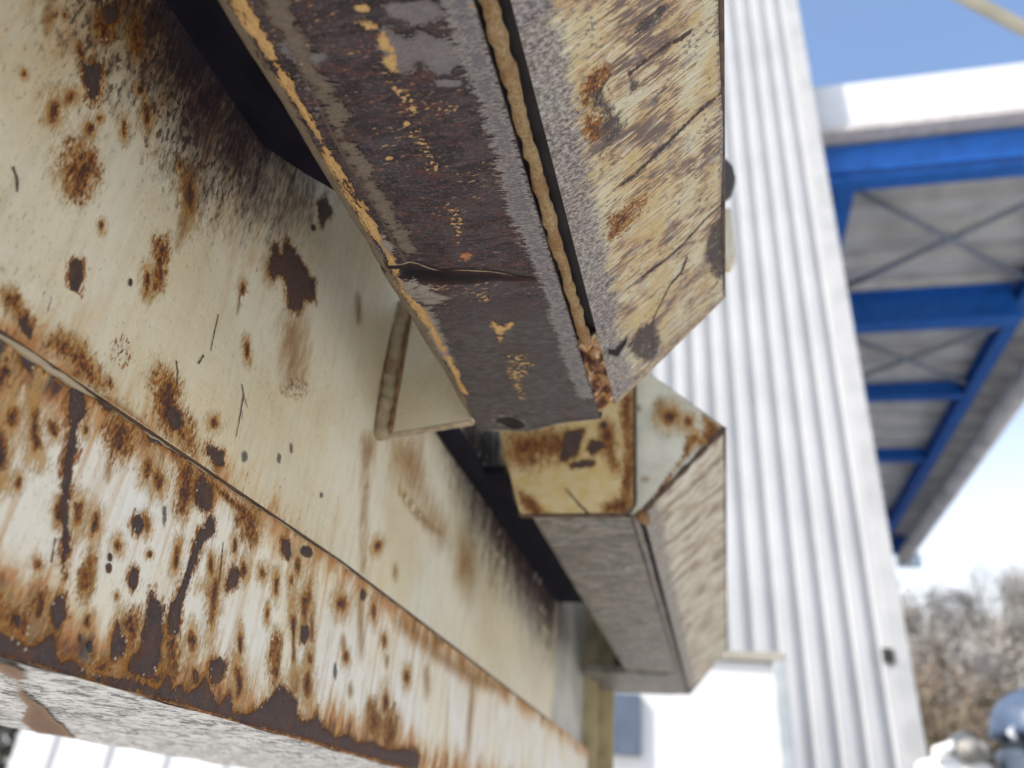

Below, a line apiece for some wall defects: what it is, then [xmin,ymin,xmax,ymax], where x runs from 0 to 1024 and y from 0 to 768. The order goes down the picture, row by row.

rust [41,85,105,206]
rust [64,256,86,299]
rust [138,155,202,304]
peeling [218,0,474,413]
crack [371,236,551,290]
peeling [373,0,594,400]
rust [364,313,412,462]
rust [0,285,317,716]
rust [597,390,647,513]
rust [650,400,722,501]
rust [329,587,388,667]
rust [364,684,400,761]